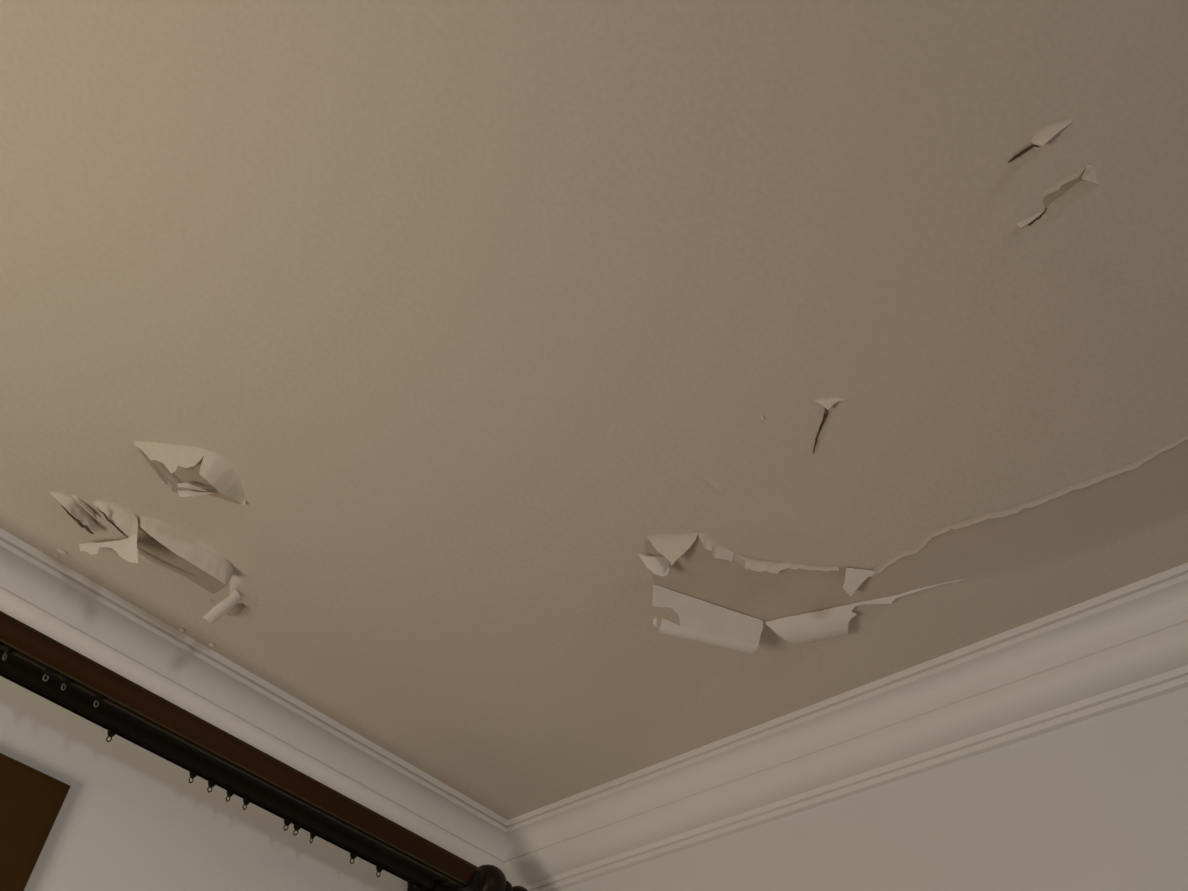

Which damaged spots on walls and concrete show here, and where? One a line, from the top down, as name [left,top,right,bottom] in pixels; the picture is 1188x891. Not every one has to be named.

peeling [134,441,247,506]
peeling [50,491,260,624]
peeling [638,518,967,654]